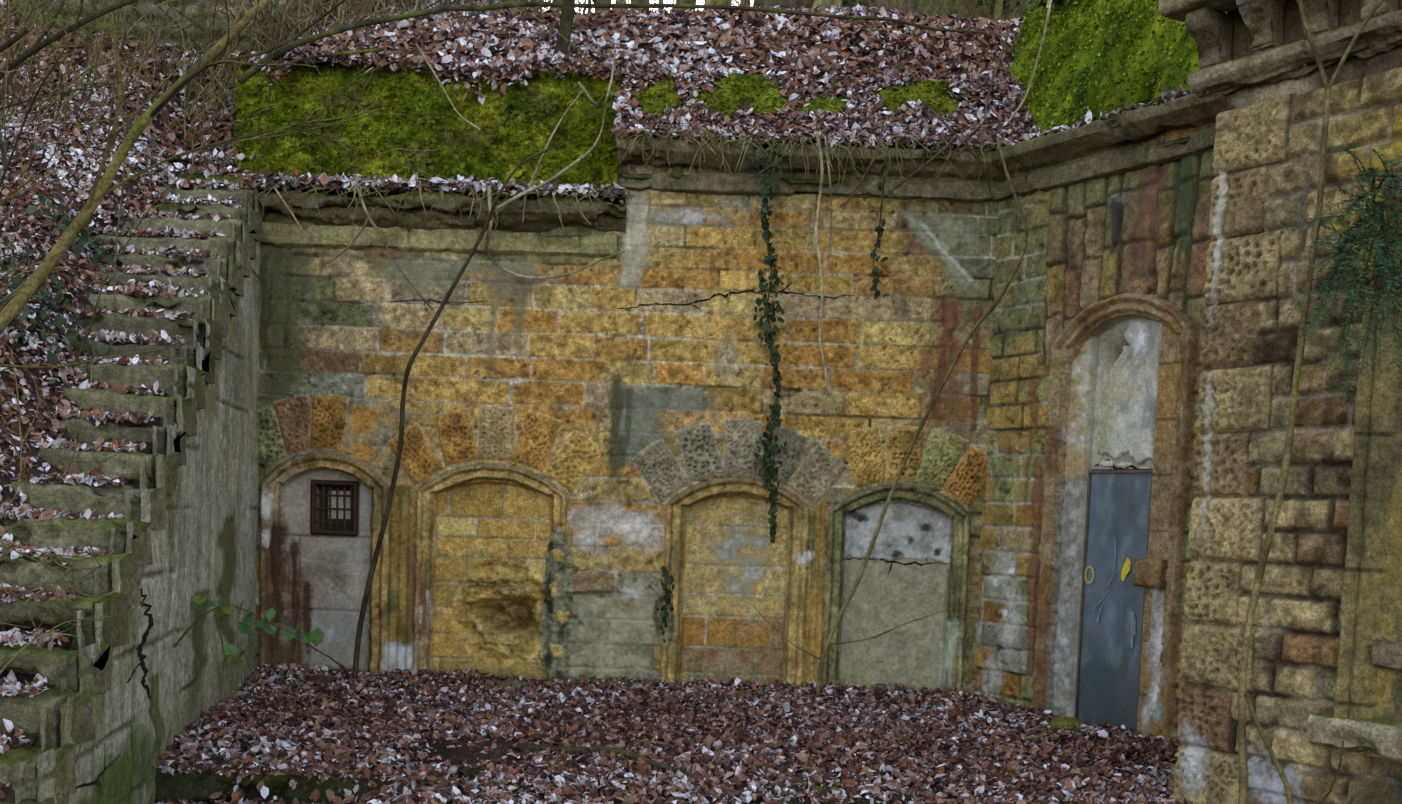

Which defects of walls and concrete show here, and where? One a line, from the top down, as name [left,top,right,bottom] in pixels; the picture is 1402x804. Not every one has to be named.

rust [918,300,982,444]
flaking render [1097,323,1161,469]
flaking render [452,525,676,684]
crack [842,556,951,574]